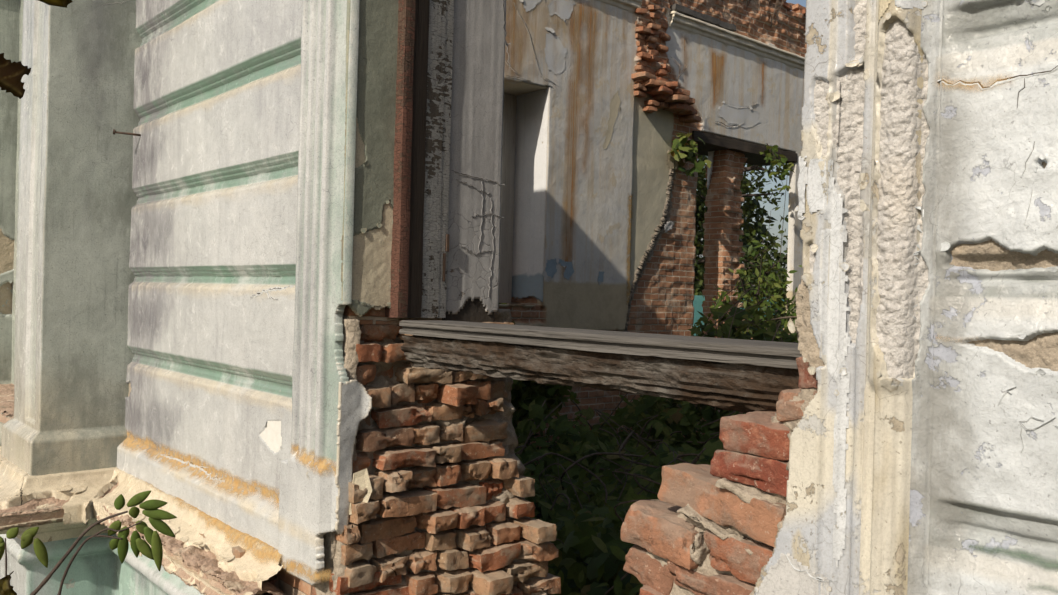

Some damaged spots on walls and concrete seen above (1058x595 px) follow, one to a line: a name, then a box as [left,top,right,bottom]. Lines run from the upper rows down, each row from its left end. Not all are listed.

crack [937,65,1058,108]
peeling [344,109,369,168]
corrosion [565,4,596,270]
spalling [0,229,14,317]
peeling [341,200,393,310]
crack [452,170,507,290]
spalling [787,0,929,568]
spalling [940,239,1058,272]
peeling [260,420,283,453]
spalling [0,472,287,595]
peeling [349,468,372,515]
peeling [754,553,832,595]